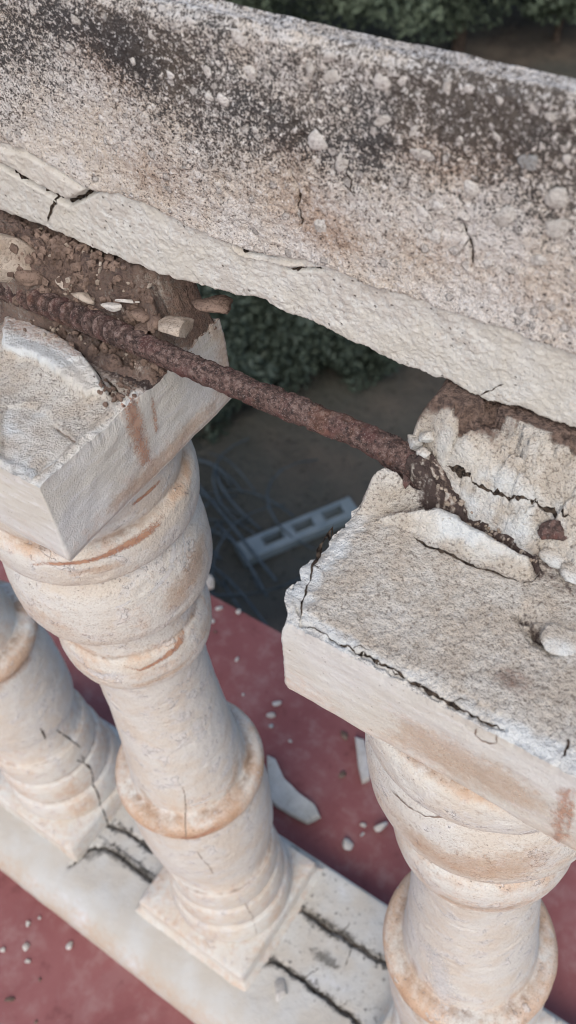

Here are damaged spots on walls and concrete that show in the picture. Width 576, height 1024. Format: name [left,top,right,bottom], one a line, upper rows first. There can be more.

crack [15,170,94,220]
crack [291,170,309,225]
crack [459,224,474,261]
spalling [0,210,217,385]
corrosion [121,398,157,466]
spalling [354,379,576,582]
corrosion [37,522,160,566]
crack [413,536,540,583]
crack [299,527,503,730]
crack [561,739,570,759]
crack [40,729,152,883]
crack [301,910,386,966]